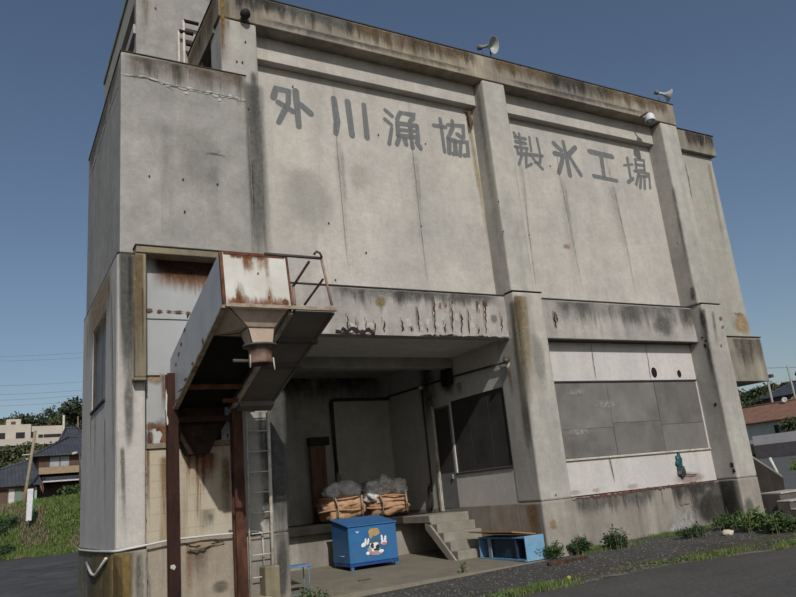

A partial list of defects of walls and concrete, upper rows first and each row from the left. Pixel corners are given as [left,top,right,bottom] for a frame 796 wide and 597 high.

leakage [236,0,474,68]
leakage [112,253,134,371]
rust [134,254,191,322]
rust [160,260,214,288]
rust [230,254,267,275]
rust [229,290,289,305]
leakage [511,301,526,398]
rust [147,423,166,491]
leakage [577,490,662,510]
leakage [673,480,753,520]